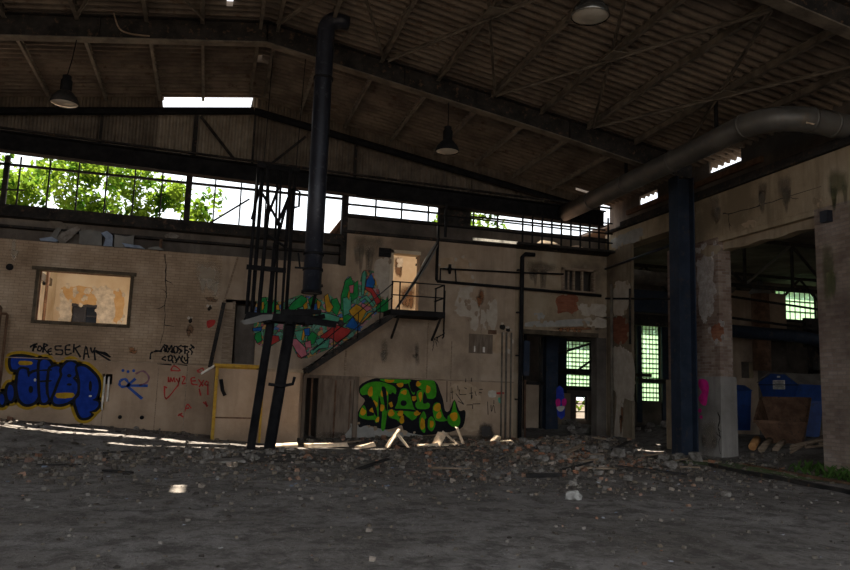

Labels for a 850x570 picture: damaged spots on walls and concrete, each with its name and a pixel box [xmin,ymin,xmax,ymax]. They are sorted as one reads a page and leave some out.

peeling [56,283,125,324]
crack [157,254,173,343]
peeling [438,255,514,354]
peeling [523,280,631,330]
peeling [695,241,725,345]
peeling [613,345,636,437]